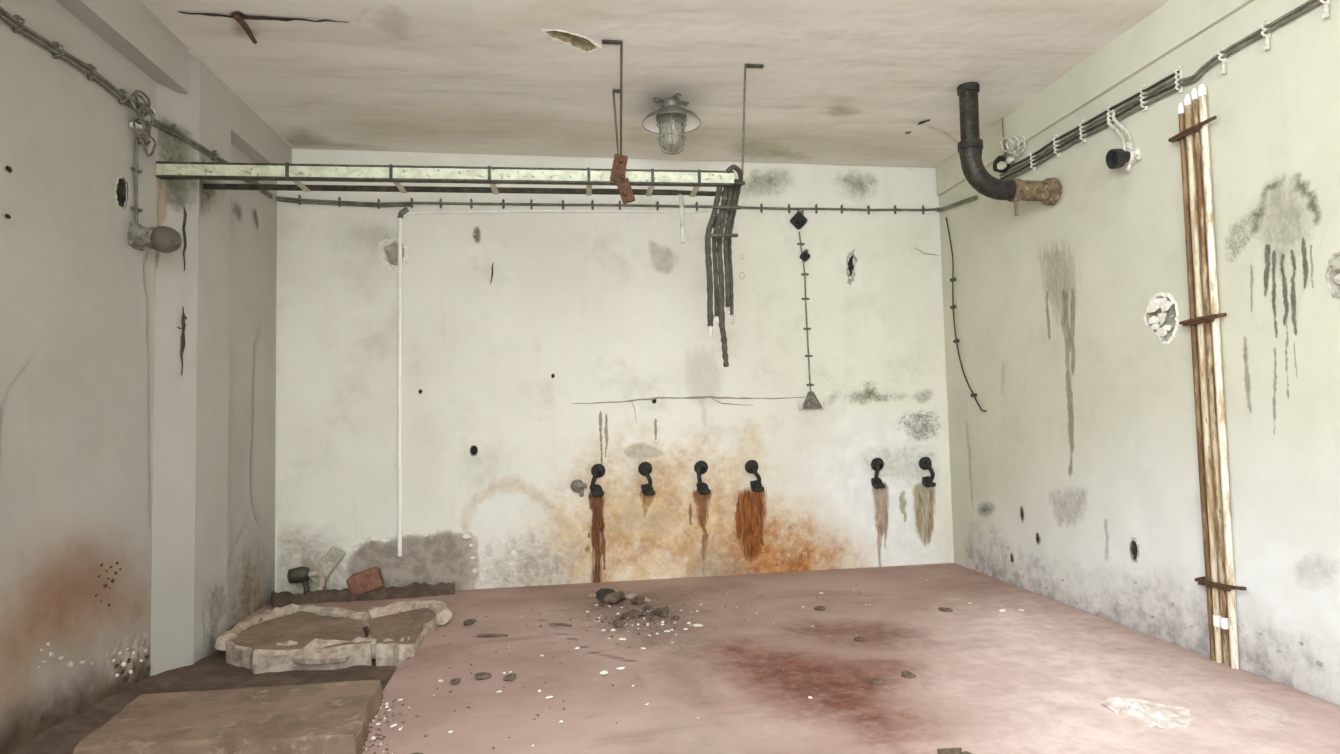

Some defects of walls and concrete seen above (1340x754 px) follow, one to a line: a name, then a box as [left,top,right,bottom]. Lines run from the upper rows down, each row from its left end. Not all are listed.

crack [177,307,187,375]
crack [180,206,188,271]
water stain [647,238,674,276]
water stain [599,343,724,465]
water stain [719,161,1340,615]
flaking render [1143,292,1179,345]
flaking render [1324,251,1340,299]
water stain [460,472,578,534]
corrosion [505,401,938,582]
corrosion [0,484,151,682]
water stain [525,492,1340,754]
flaking render [954,502,1340,705]